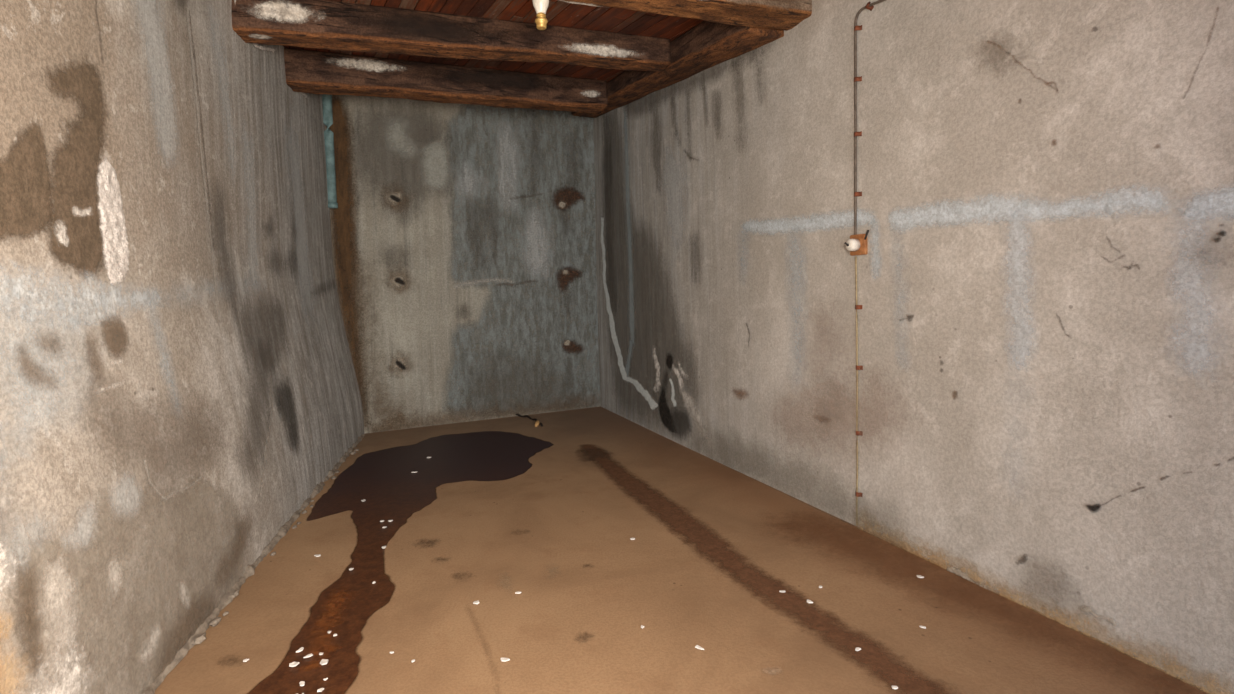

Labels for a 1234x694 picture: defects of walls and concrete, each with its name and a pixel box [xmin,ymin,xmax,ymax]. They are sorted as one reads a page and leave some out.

damp [0,63,106,278]
damp [137,0,176,157]
damp [90,320,127,370]
damp [247,106,707,694]
damp [580,444,948,694]
crack [1087,504,1100,512]